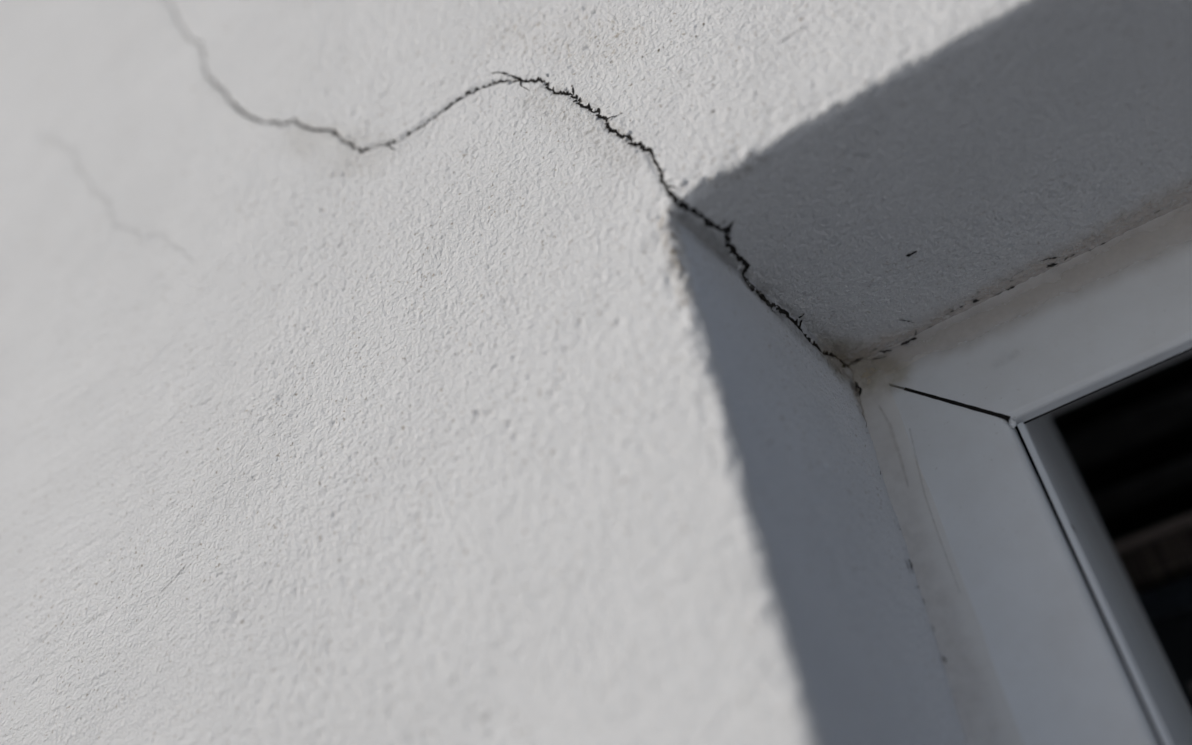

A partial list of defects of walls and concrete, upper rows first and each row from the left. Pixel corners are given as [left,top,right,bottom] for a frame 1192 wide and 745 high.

crack [167,0,1014,368]
crack [1041,242,1105,268]
crack [904,387,1011,422]